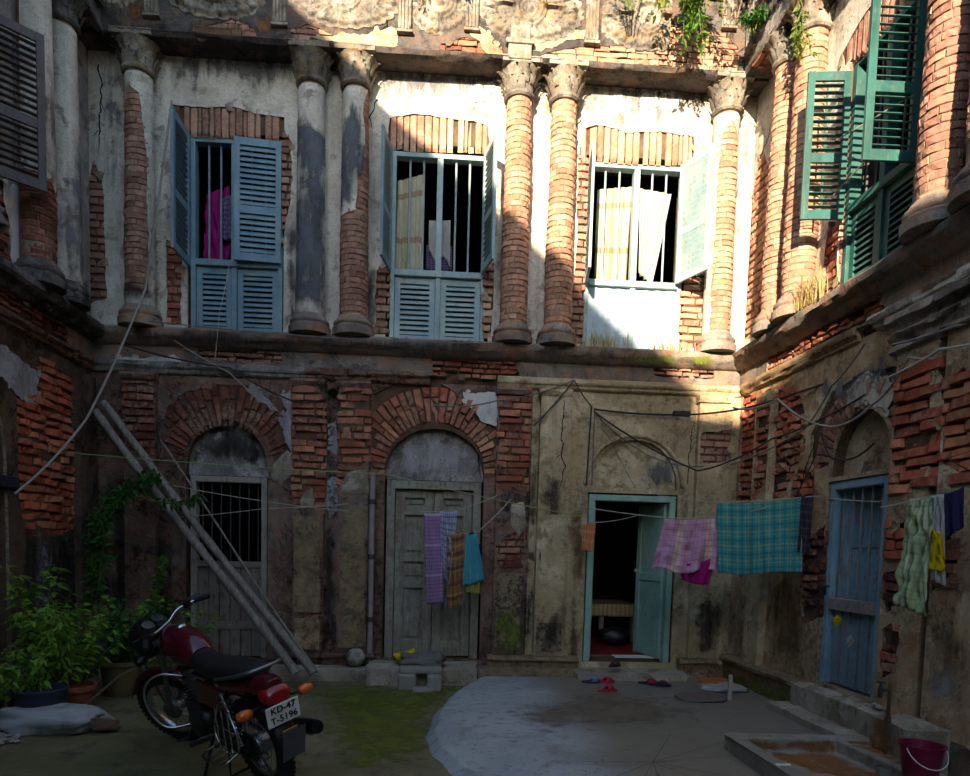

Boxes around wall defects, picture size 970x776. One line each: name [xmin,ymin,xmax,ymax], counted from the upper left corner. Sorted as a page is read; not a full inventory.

crack [93,64,107,152]
leakage [289,122,325,305]
spalling [339,86,391,334]
spalling [544,99,697,346]
spalling [532,24,740,71]
peeling [642,90,682,112]
spalling [678,122,739,350]
spalling [745,0,910,339]
spalling [913,0,970,203]
spalling [0,344,76,537]
spalling [115,347,532,518]
spalling [699,355,970,503]